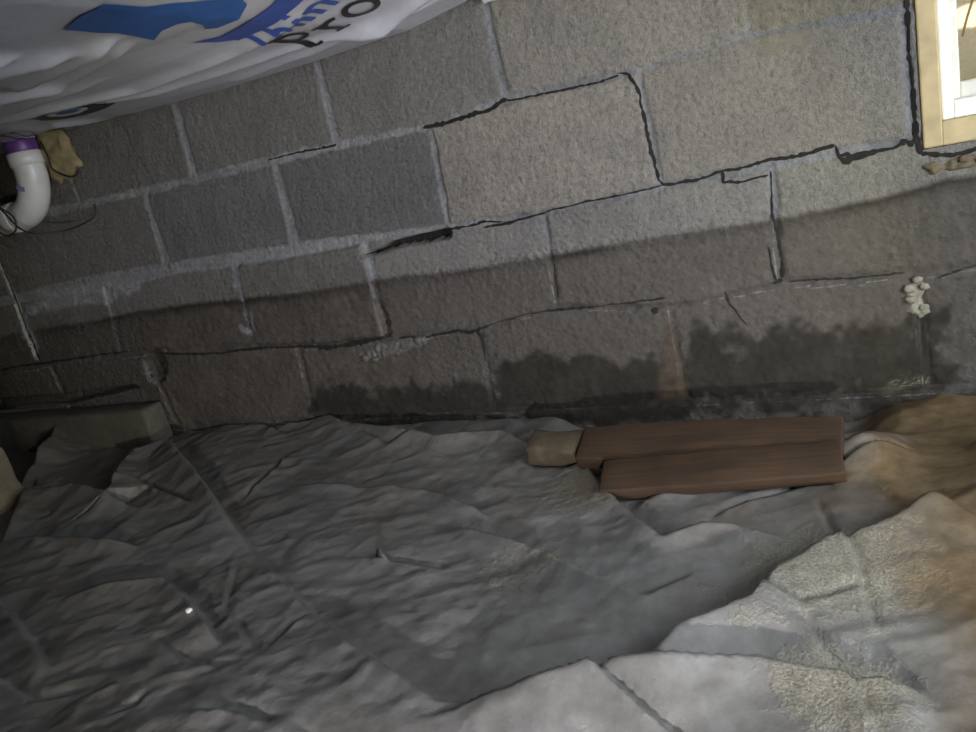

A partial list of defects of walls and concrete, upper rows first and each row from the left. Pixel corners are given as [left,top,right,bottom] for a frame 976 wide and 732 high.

crack [268,144,336,160]
crack [165,267,665,362]
damp [0,177,976,435]
crack [724,292,747,325]